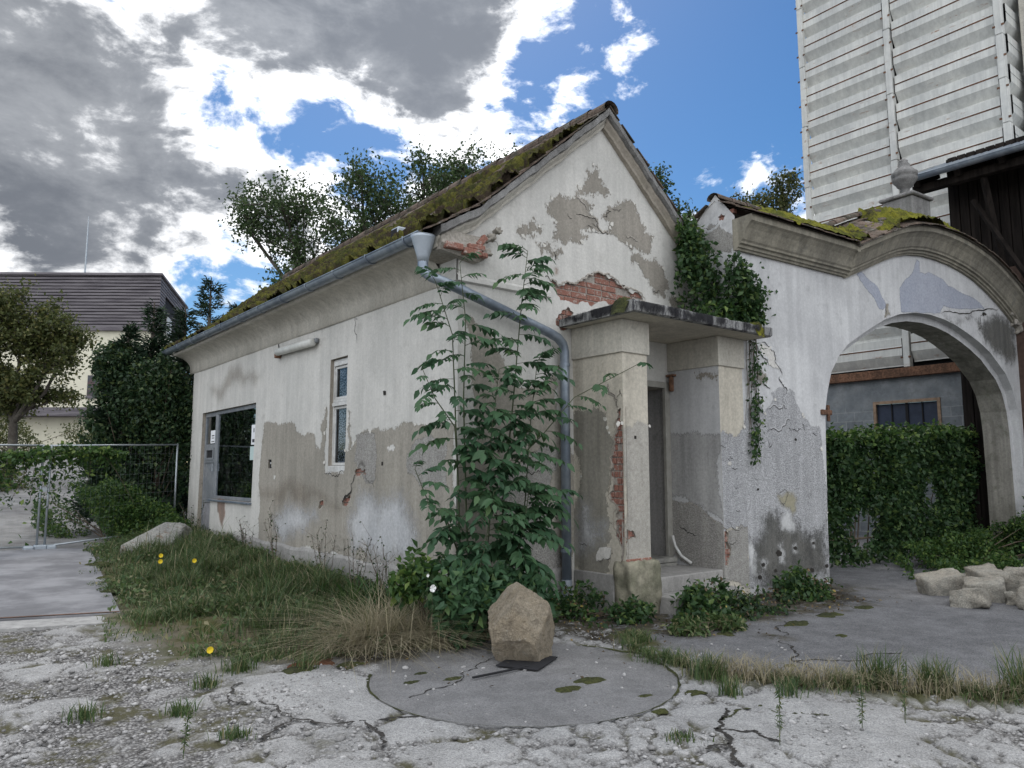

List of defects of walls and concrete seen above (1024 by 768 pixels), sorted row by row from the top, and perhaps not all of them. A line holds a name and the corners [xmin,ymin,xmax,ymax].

spalling [443,227,503,259]
flaking render [516,163,685,331]
peeling [258,310,652,574]
spalling [672,339,829,588]
water stain [748,494,826,586]